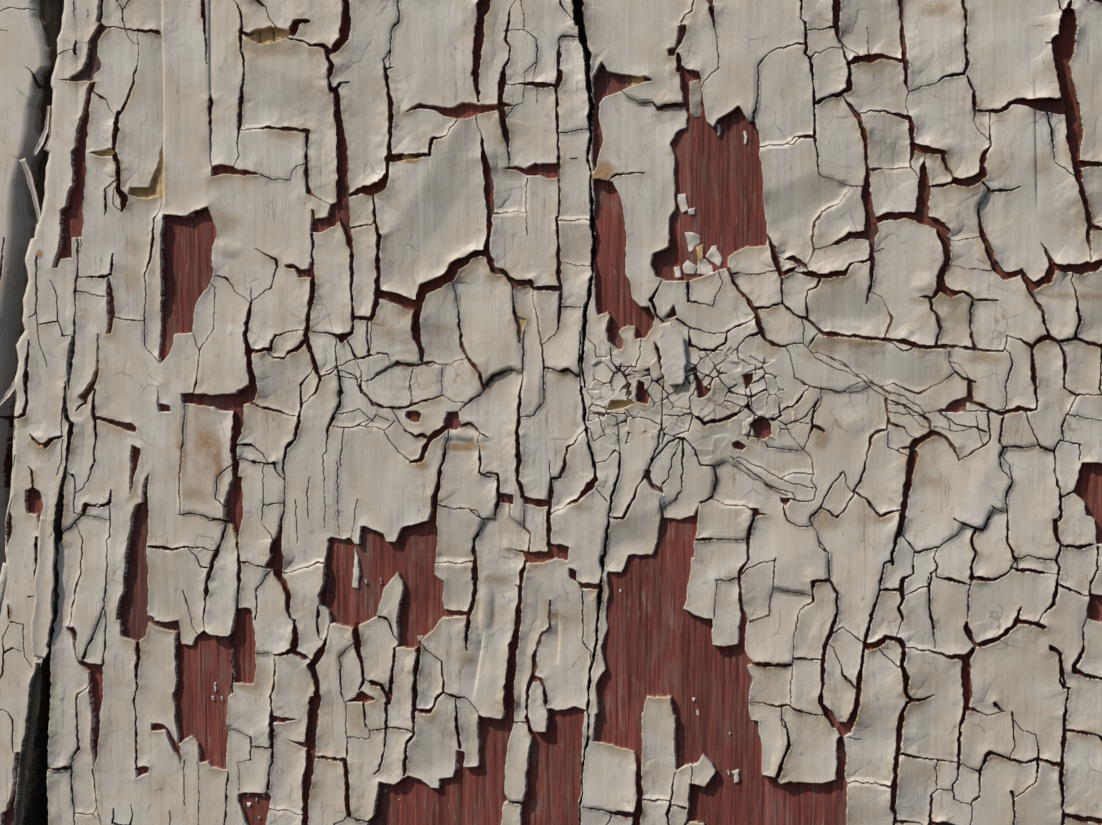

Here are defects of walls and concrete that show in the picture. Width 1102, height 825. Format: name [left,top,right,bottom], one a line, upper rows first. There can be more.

crack [26,67,43,89]
crack [57,0,161,215]
peeling [651,0,767,281]
peeling [159,208,217,362]
crack [148,0,642,825]
crack [609,0,1102,825]
crack [133,641,200,825]
peeling [117,446,256,769]
peeling [318,503,470,649]
peeling [369,707,515,825]
crack [581,762,693,825]
peeling [521,505,848,825]